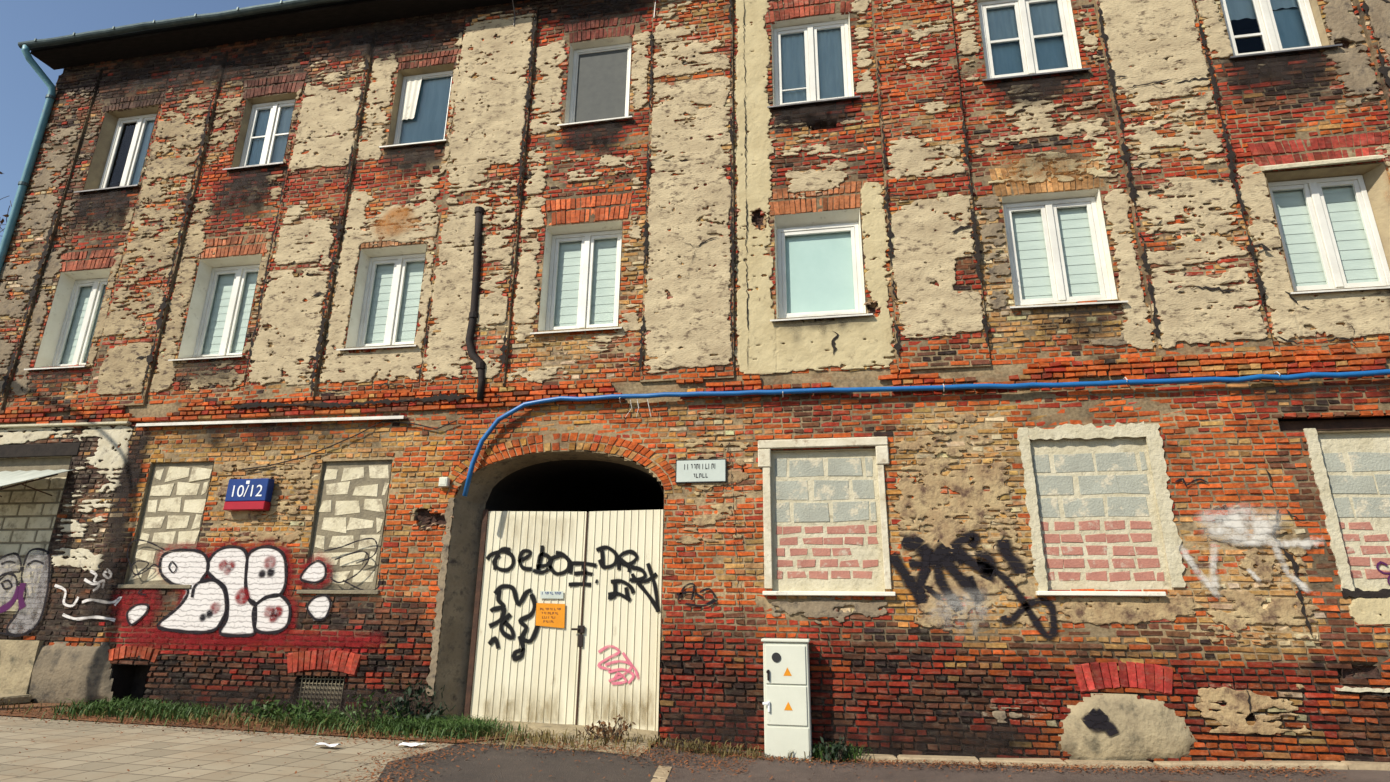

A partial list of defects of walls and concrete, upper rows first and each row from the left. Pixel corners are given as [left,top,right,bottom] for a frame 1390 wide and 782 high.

peeling [0,0,1390,399]
peeling [0,425,134,571]
peeling [215,458,317,545]
spalling [409,507,454,530]
peeling [676,411,750,544]
peeling [1194,684,1311,735]